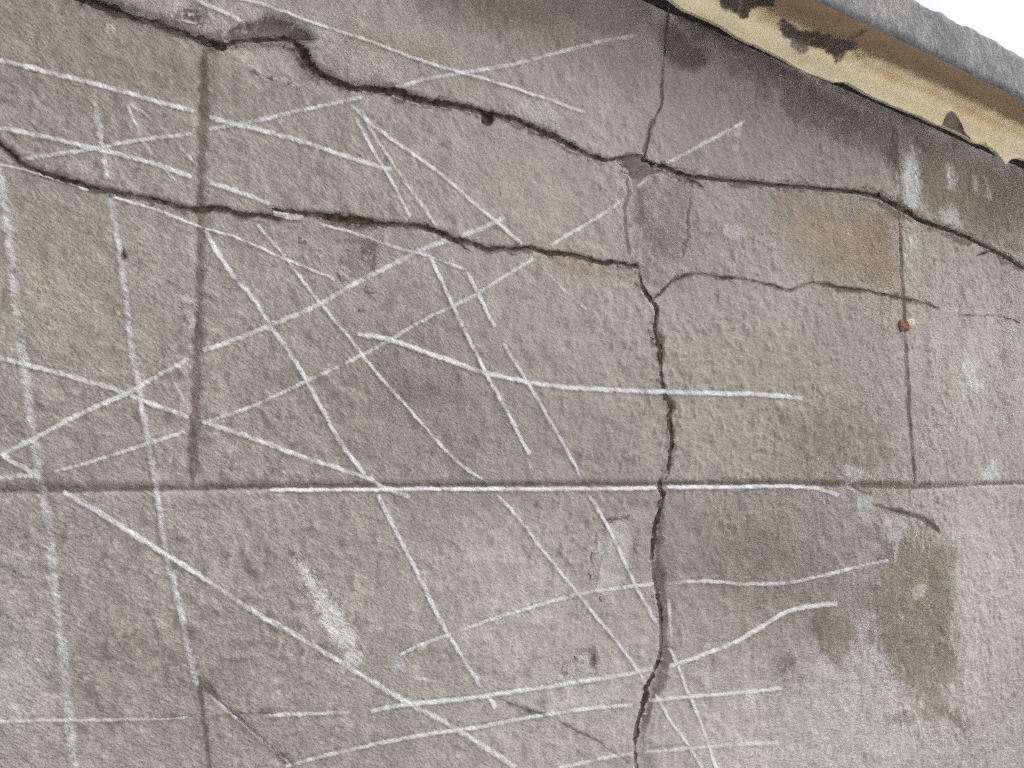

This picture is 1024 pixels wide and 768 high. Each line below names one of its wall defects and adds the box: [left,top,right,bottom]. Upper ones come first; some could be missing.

crack [80,0,1024,270]
crack [0,142,941,768]
leakage [766,529,1024,768]